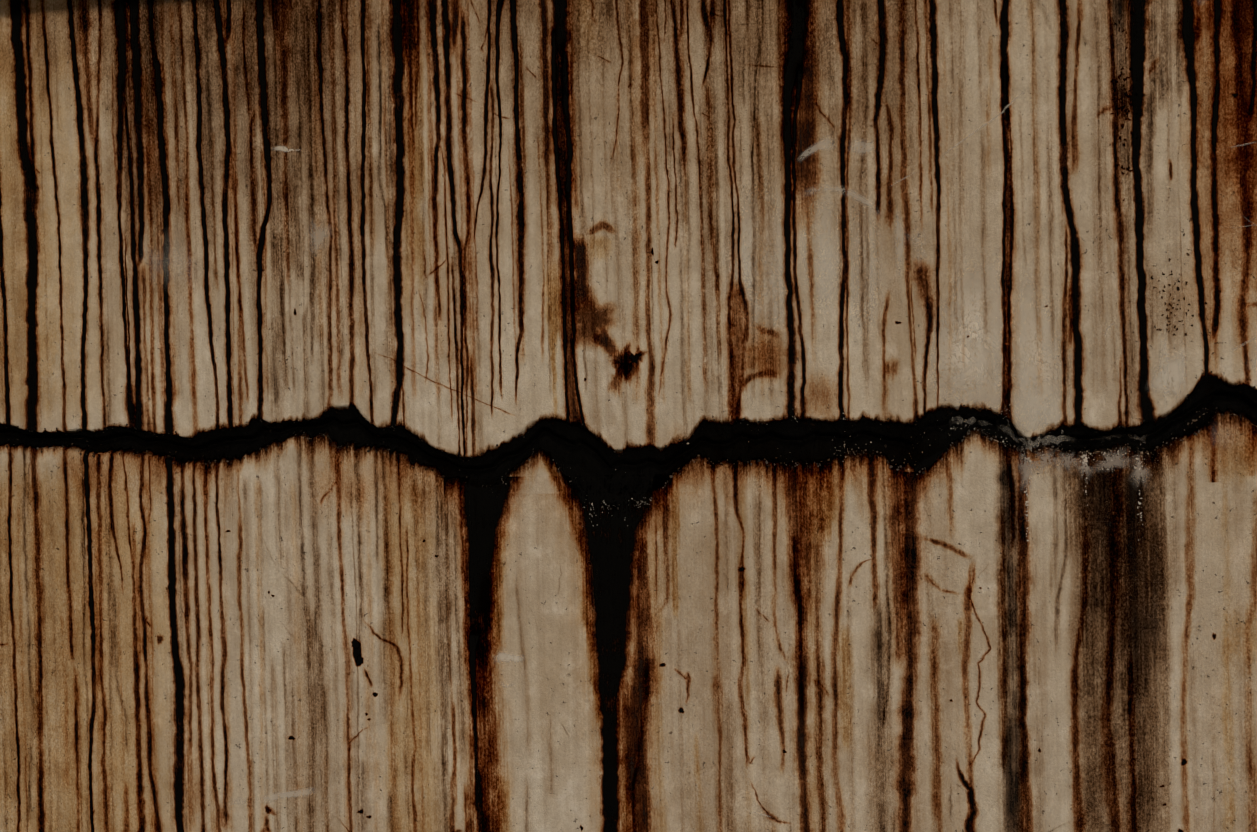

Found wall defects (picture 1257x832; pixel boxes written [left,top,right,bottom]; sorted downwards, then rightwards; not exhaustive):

corrosion [538,0,552,252]
corrosion [548,0,655,451]
corrosion [743,0,827,420]
corrosion [1196,0,1257,263]
water stain [0,0,586,832]
crack [0,308,1257,542]
water stain [543,452,676,832]
crack [927,539,991,832]